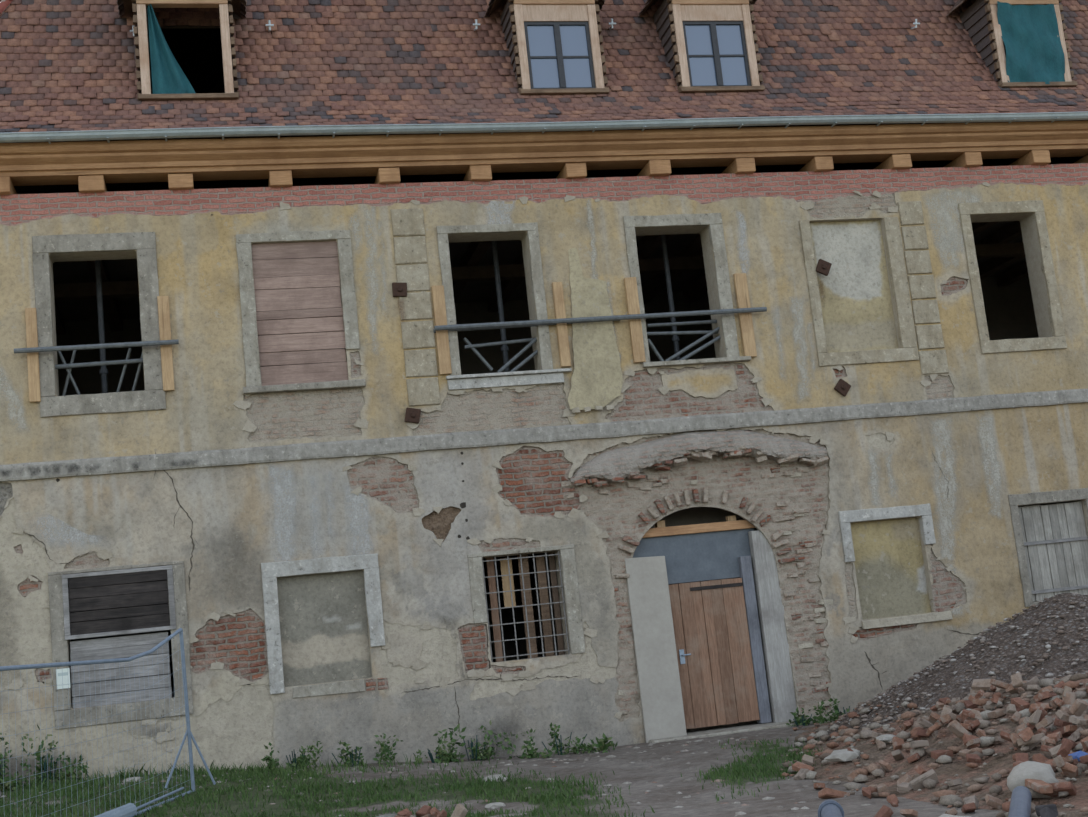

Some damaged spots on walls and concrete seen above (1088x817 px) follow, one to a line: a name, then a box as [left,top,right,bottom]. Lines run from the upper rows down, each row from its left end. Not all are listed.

flaking render [406,383,576,435]
flaking render [605,363,773,422]
flaking render [0,482,53,690]
flaking render [64,549,113,569]
crack [154,451,200,591]
flaking render [343,456,461,546]
flaking render [455,428,833,722]
flaking render [842,563,917,643]
flaking render [929,544,969,612]
flaking render [189,608,269,686]